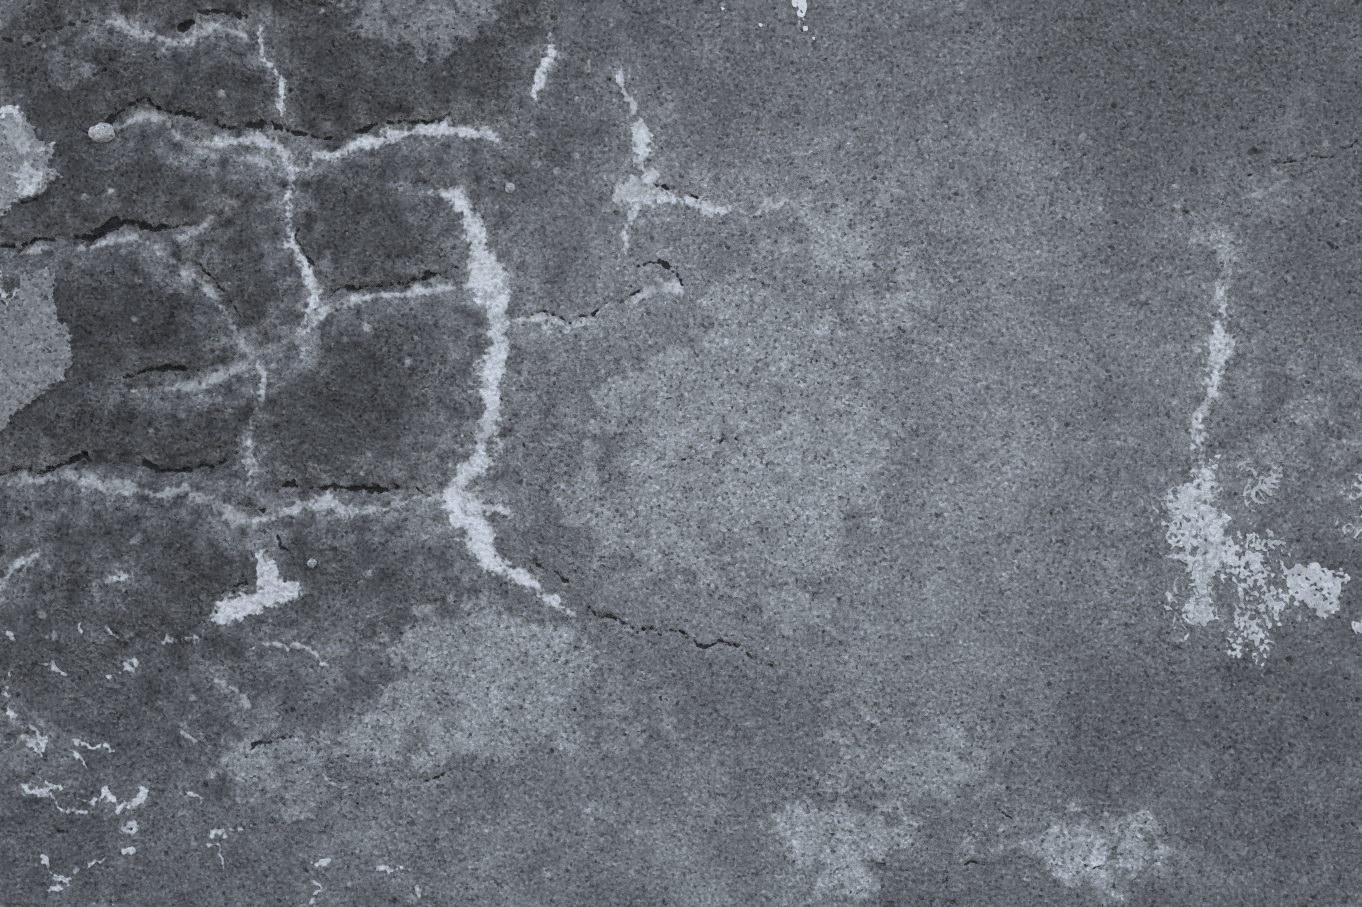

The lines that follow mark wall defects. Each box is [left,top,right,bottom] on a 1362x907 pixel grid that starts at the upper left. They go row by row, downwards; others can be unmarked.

flaking render [0,104,62,217]
flaking render [0,266,73,431]
crack [0,3,790,667]
leakage [550,140,943,648]
leakage [1151,183,1350,667]
leakage [105,569,140,600]
leakage [106,658,139,679]
leakage [161,634,200,645]
leakage [210,534,303,625]
leakage [1351,621,1362,634]